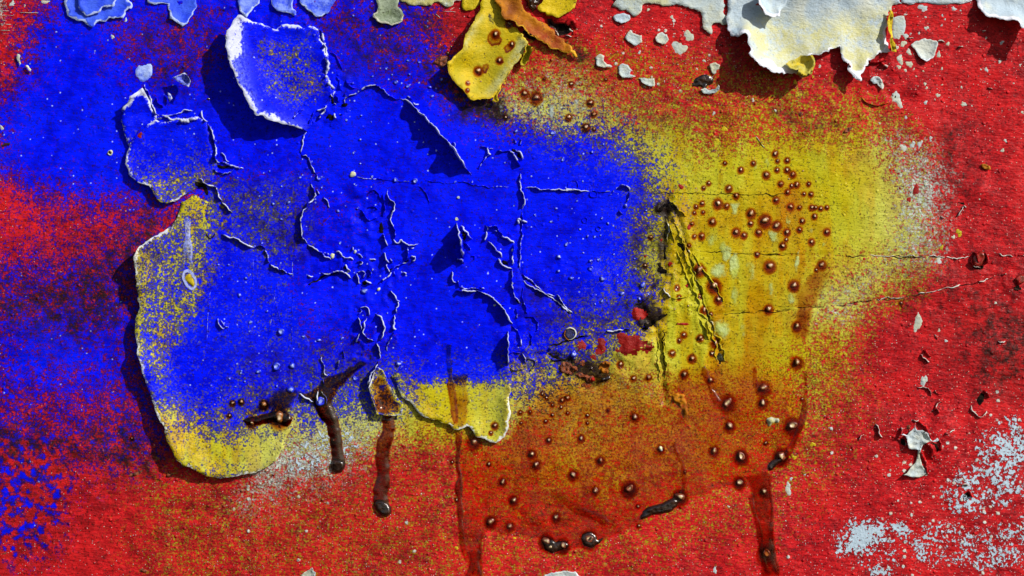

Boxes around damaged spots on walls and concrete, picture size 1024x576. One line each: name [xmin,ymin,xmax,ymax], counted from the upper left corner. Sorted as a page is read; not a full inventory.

peeling [225,0,336,129]
peeling [373,0,578,102]
peeling [613,0,1024,98]
crack [144,29,1024,386]
peeling [121,88,310,479]
corrosion [243,362,365,474]
corrosion [373,389,398,517]
peeling [369,356,512,443]
corrosion [559,360,613,389]
corrosion [447,367,808,576]
corrosion [798,308,809,330]
peeling [897,419,943,477]